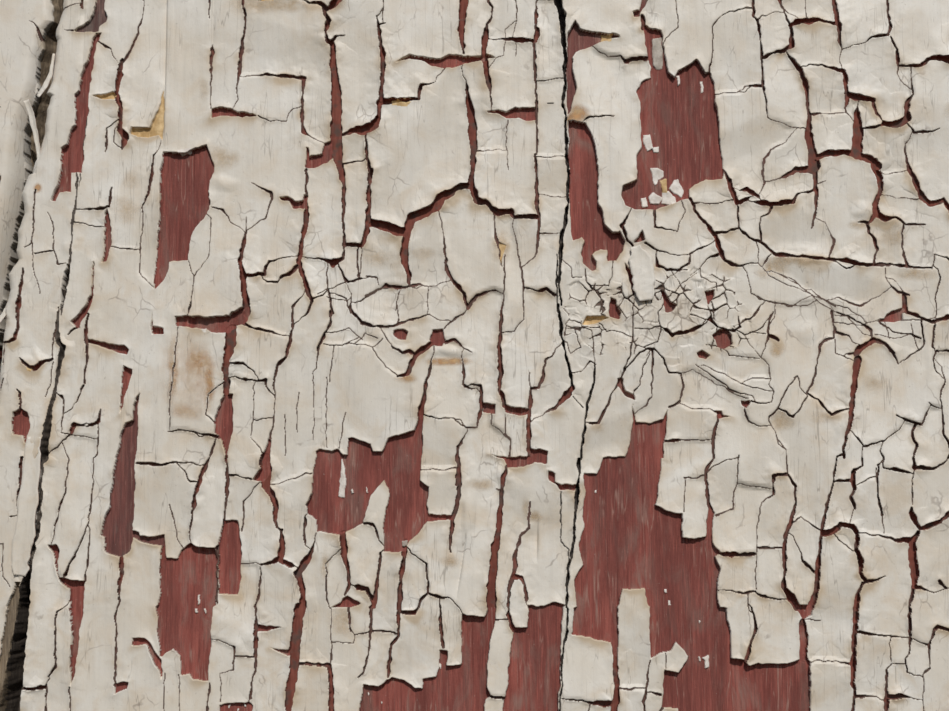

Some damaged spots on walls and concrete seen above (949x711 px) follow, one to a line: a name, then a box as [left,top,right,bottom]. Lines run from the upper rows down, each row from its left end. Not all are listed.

crack [30,21,45,42]
crack [98,0,145,152]
peeling [154,145,214,289]
peeling [565,22,677,313]
peeling [621,0,723,210]
crack [135,0,577,711]
crack [22,600,71,711]
crack [113,557,180,711]
peeling [101,367,242,681]
peeling [306,415,453,552]
peeling [359,607,496,711]
peeling [503,410,811,711]